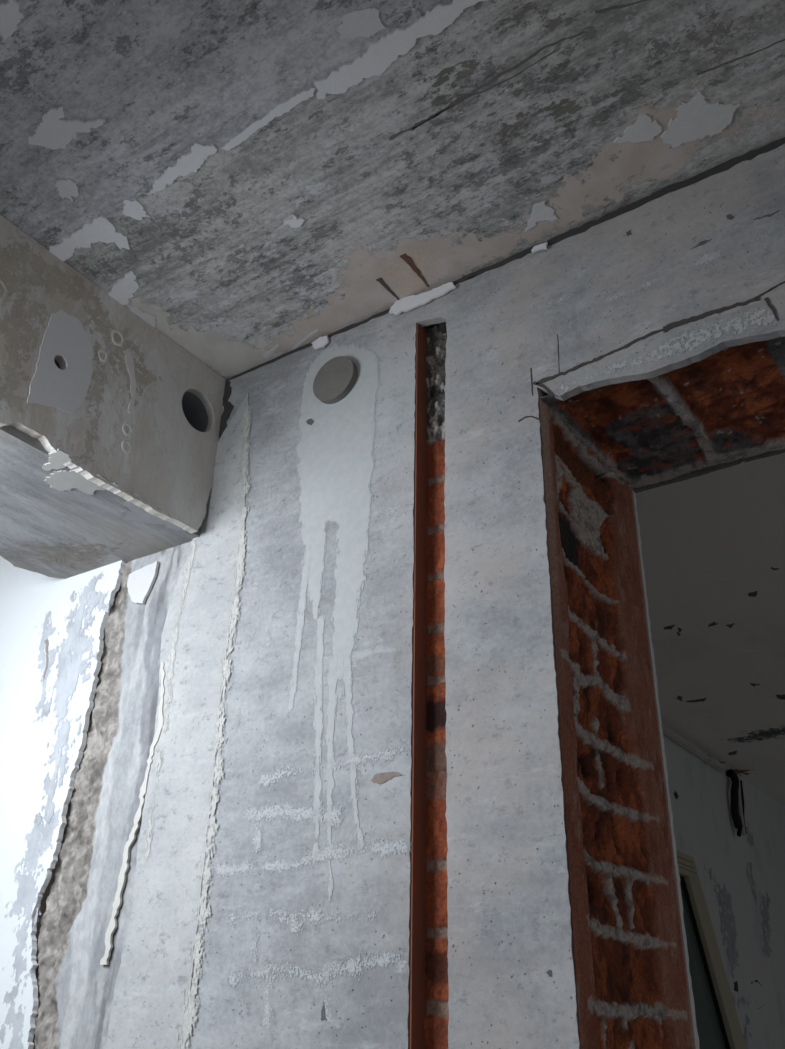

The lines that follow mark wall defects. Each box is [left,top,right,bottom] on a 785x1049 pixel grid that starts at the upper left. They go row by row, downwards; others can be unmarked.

peeling [122,0,488,220]
crack [389,0,647,141]
crack [696,39,785,76]
peeling [49,215,130,261]
flaking render [557,305,776,393]
spalling [0,448,192,1049]
water stain [175,405,275,1049]
water stain [225,342,409,1031]